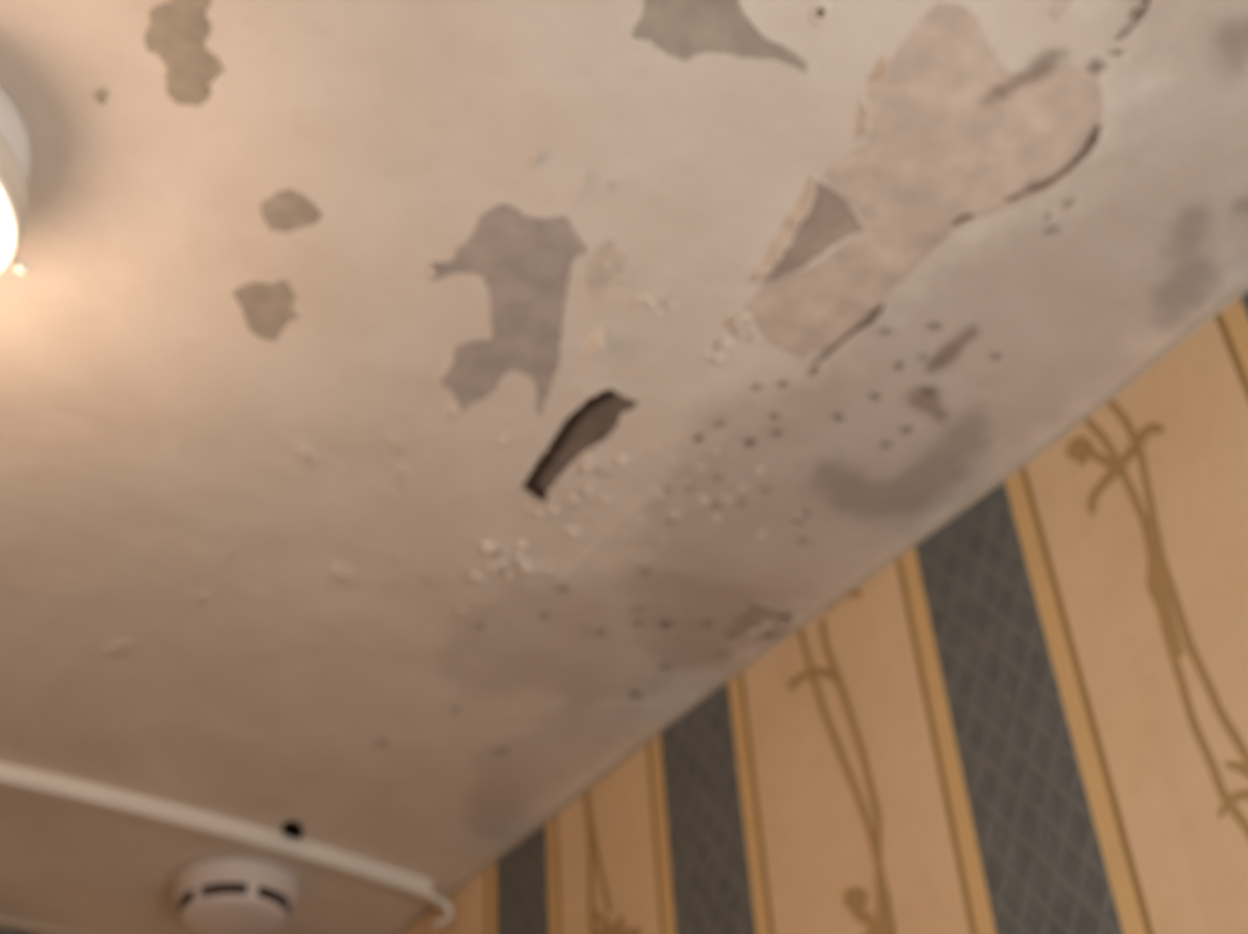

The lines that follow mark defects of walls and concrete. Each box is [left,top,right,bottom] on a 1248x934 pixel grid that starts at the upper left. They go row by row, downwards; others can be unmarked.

peeling [137,0,231,113]
peeling [618,0,819,82]
peeling [252,182,327,237]
peeling [732,0,1117,365]
peeling [225,274,306,346]
peeling [413,194,648,507]